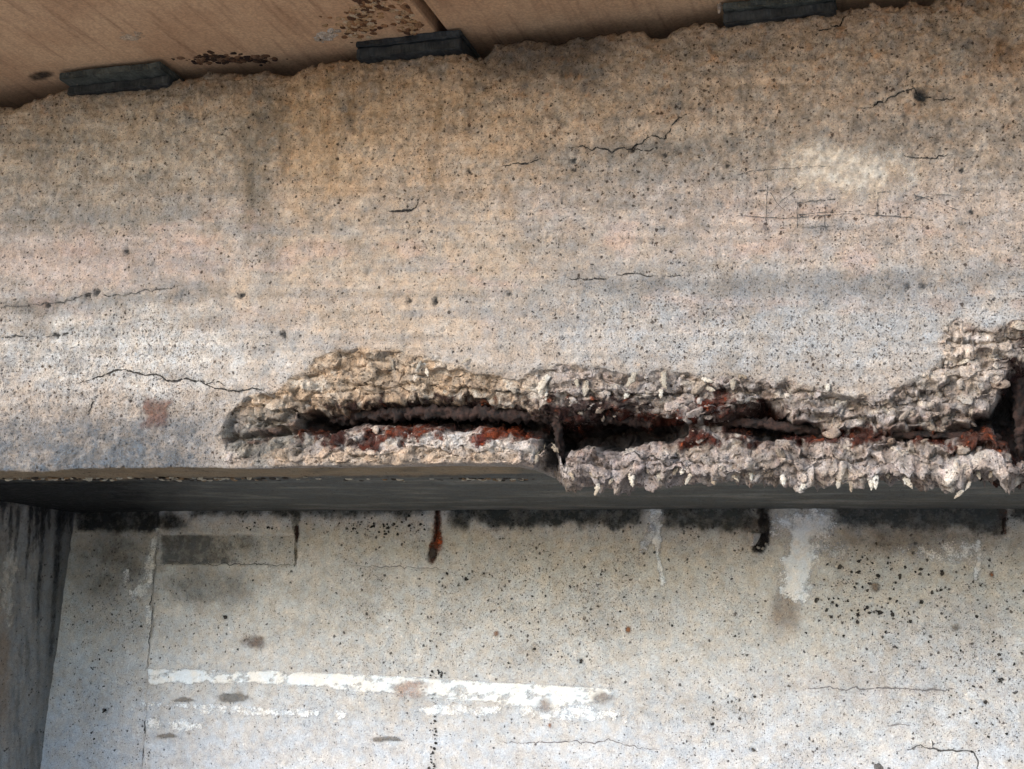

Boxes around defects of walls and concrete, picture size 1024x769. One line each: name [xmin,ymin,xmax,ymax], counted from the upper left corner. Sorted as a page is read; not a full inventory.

crack [861,87,953,109]
crack [568,114,687,154]
crack [389,198,420,212]
crack [0,285,183,308]
crack [569,273,680,281]
crack [76,369,268,415]
spalling [215,313,1024,499]
corrosion [428,511,443,563]
water stain [450,508,753,586]
water stain [770,508,1024,603]